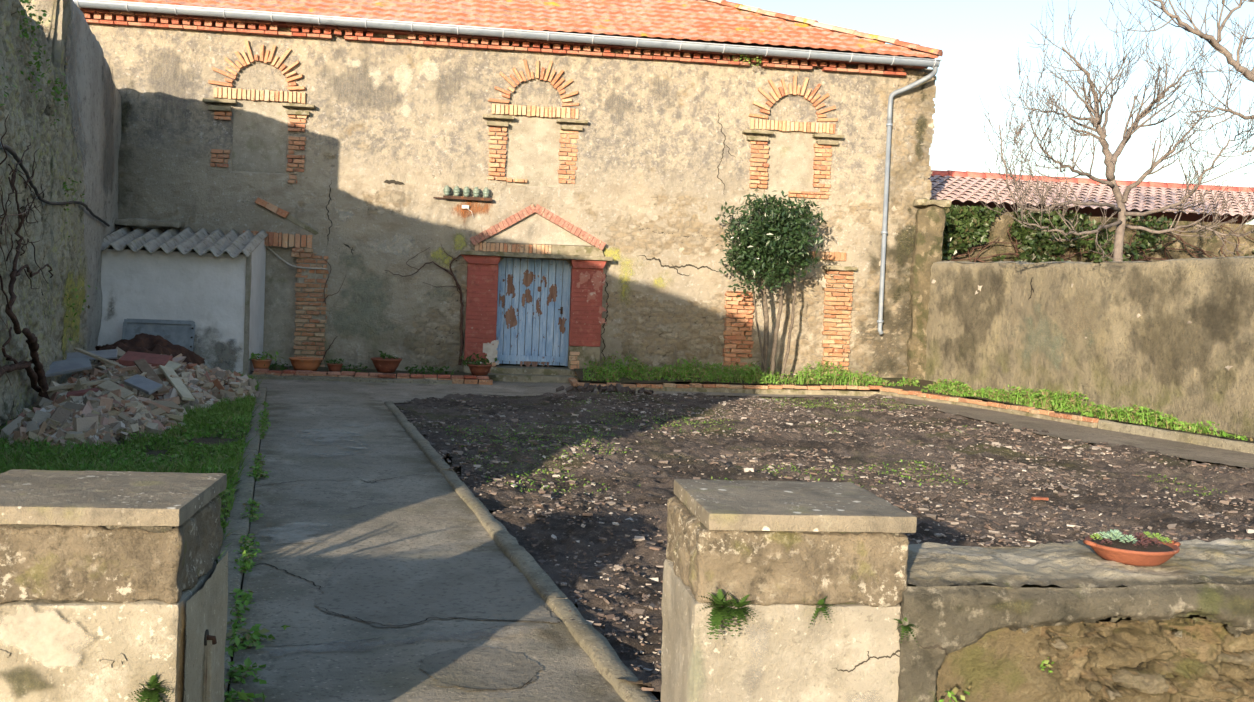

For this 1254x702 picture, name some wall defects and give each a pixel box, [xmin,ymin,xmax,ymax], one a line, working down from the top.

crack [717,109,736,194]
crack [326,182,354,255]
crack [639,228,721,276]
crack [601,271,609,361]
crack [251,563,321,590]
crack [832,607,947,672]